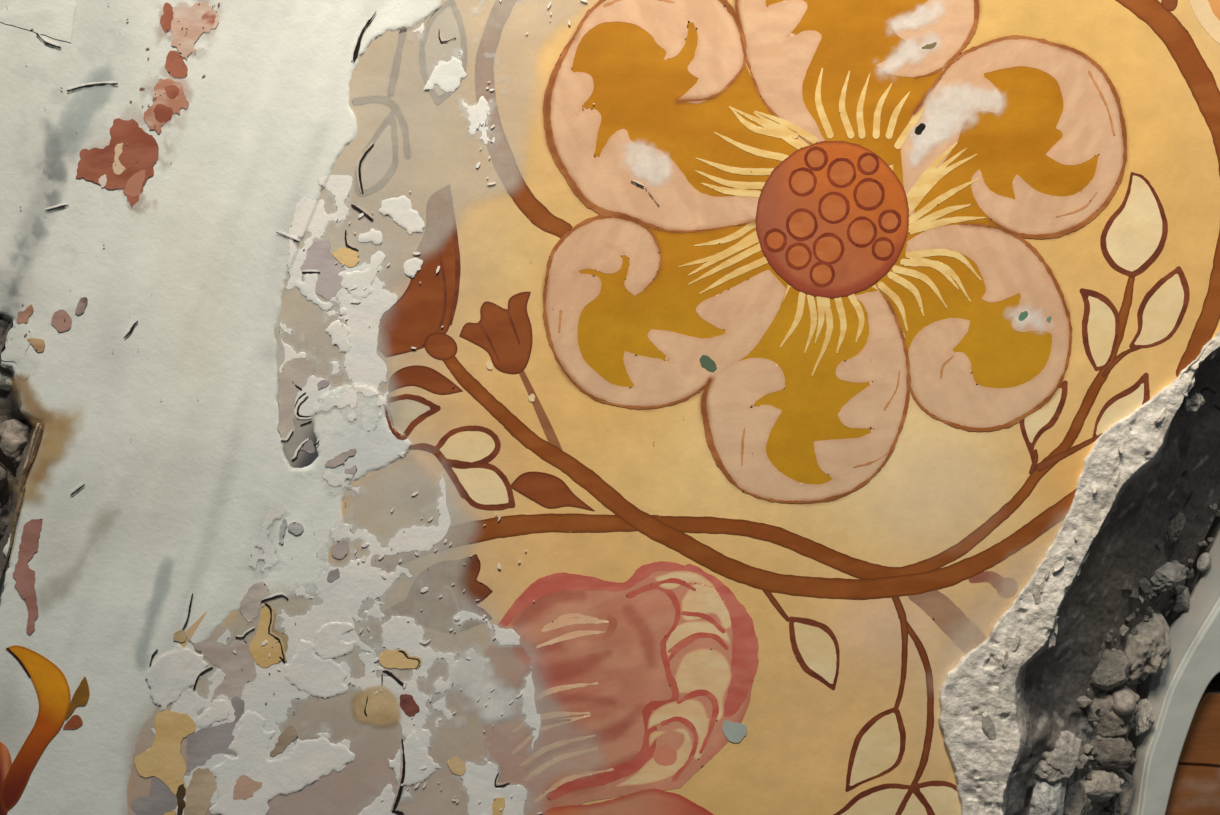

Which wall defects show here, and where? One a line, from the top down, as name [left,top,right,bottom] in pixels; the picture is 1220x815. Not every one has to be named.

peeling [76,2,219,208]
peeling [423,56,466,92]
peeling [379,195,425,234]
peeling [27,338,45,352]
peeling [51,297,88,332]
peeling [296,228,386,353]
peeling [404,258,423,278]
peeling [277,357,329,441]
spalling [0,304,42,635]
peeling [325,449,357,475]
spalling [938,330,1220,815]
peeling [131,582,466,815]